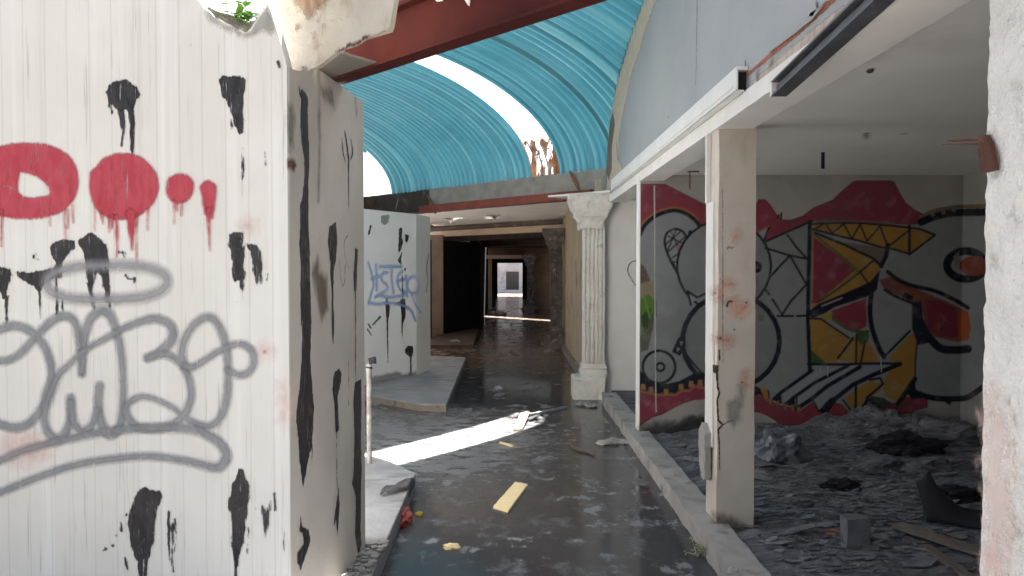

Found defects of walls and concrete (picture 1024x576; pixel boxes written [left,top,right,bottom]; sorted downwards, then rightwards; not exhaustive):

rust [747,0,836,76]
crack [713,349,732,469]